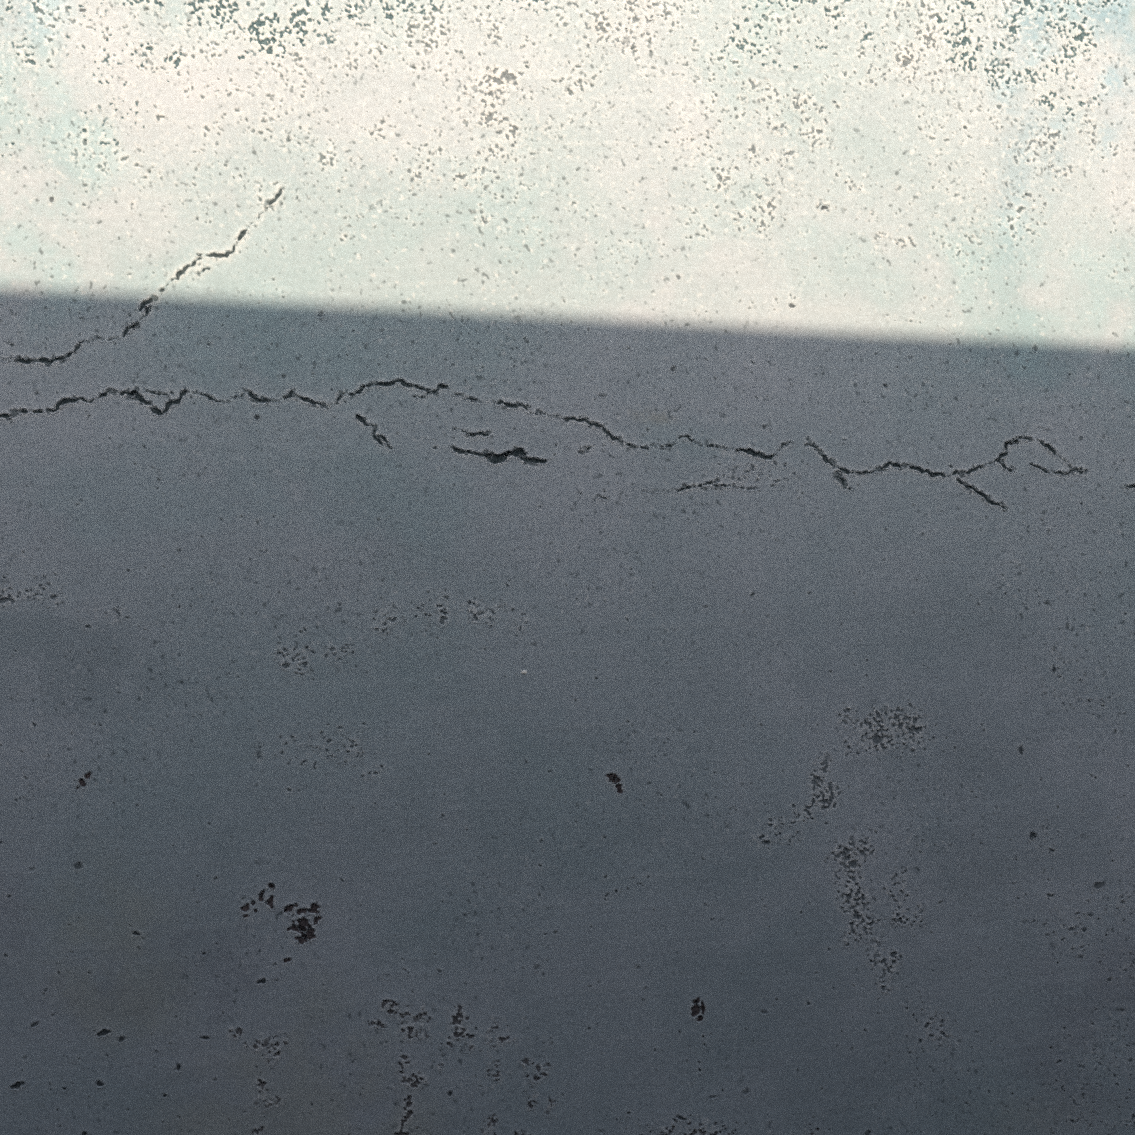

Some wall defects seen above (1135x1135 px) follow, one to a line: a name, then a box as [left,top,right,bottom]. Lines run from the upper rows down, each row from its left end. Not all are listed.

crack [0,185,285,365]
crack [0,378,1085,511]
crack [1121,482,1135,490]